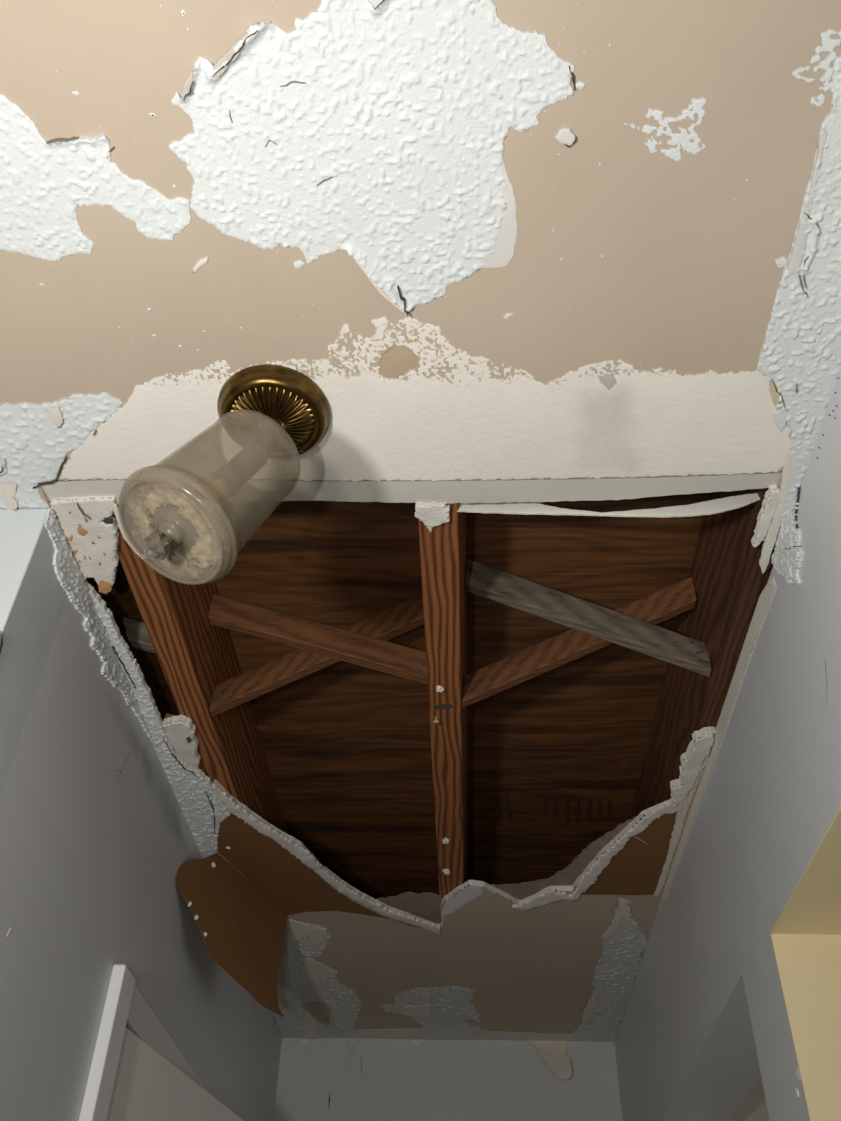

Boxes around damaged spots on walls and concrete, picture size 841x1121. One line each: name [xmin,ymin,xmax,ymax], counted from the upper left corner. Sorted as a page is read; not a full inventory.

peeling [0,0,585,316]
peeling [757,56,841,547]
peeling [0,392,123,511]
spalling [654,756,709,897]
peeling [270,919,363,1040]
peeling [380,986,494,1046]
peeling [527,898,648,1080]